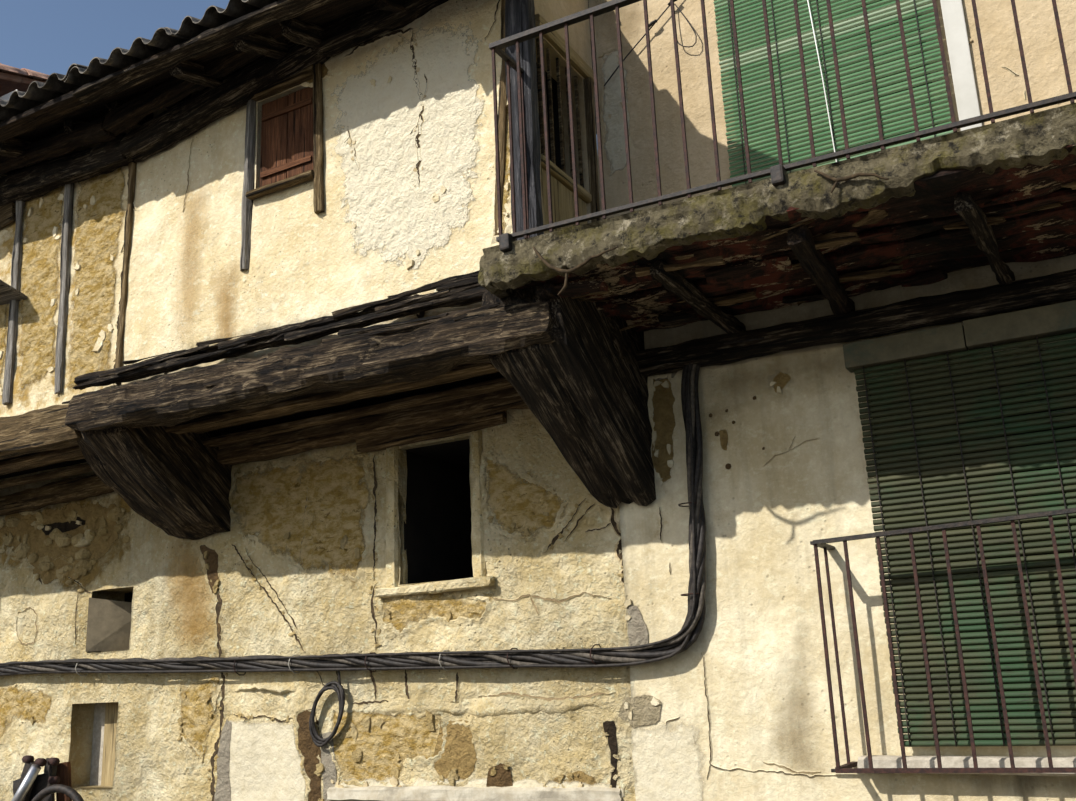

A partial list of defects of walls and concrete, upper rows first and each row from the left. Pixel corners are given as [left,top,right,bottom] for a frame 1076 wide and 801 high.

crack [343,27,428,188]
peeling [301,23,512,270]
flaking render [19,186,64,388]
flaking render [67,167,126,387]
peeling [647,371,683,492]
flaking render [0,499,130,593]
crack [202,487,338,801]
crack [352,455,411,706]
crack [438,672,461,703]
flaking render [291,702,633,801]
crack [483,498,624,615]
crack [659,507,672,574]